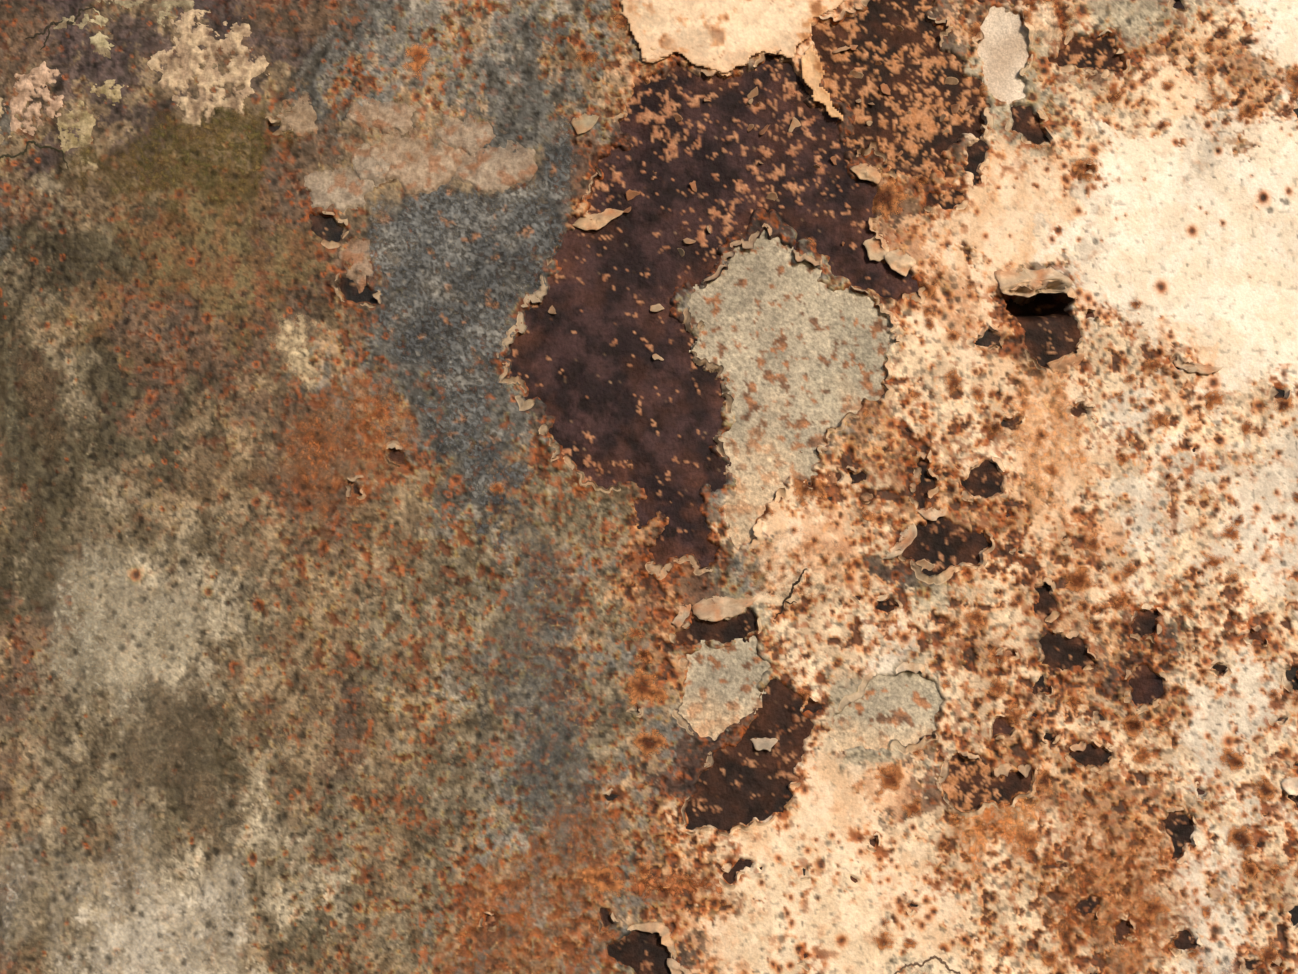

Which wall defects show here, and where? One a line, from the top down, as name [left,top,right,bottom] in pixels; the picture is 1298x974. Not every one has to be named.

peeling [1019,7,1131,79]
peeling [496,0,1054,585]
peeling [994,265,1102,323]
damp [276,315,319,388]
peeling [1025,341,1085,374]
damp [50,545,192,710]
rust [1062,558,1128,633]
peeling [681,671,877,837]
rust [875,766,904,795]
rust [1220,748,1245,770]
rust [1227,826,1298,878]
rust [874,919,917,950]